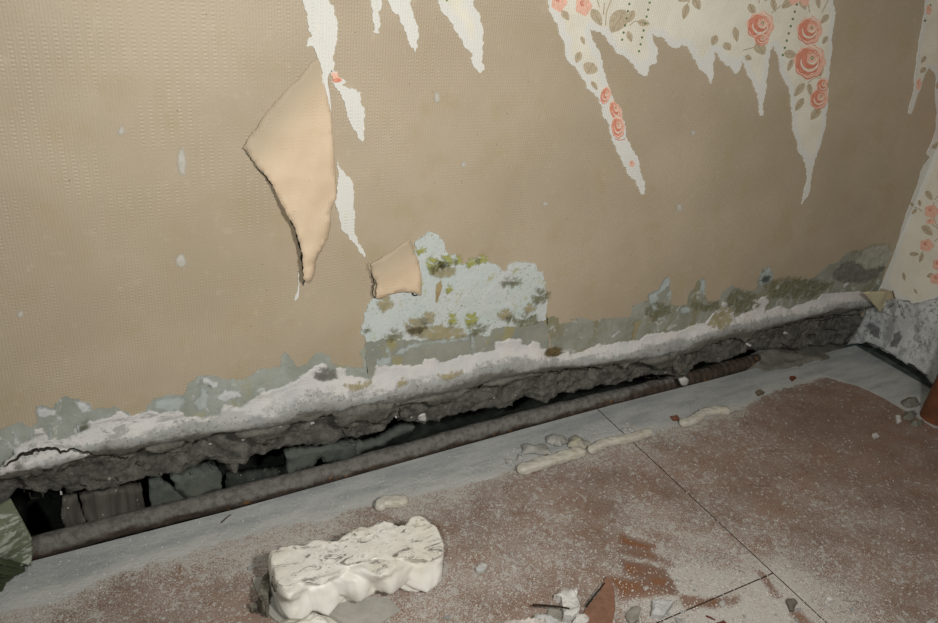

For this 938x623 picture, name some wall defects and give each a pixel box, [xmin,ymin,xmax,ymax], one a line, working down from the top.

peeling [302,0,338,84]
peeling [370,0,419,52]
peeling [438,0,485,73]
water stain [416,248,488,294]
water stain [377,296,394,313]
water stain [388,312,486,342]
peeling [146,246,890,417]
water stain [497,289,550,326]
water stain [868,324,880,339]
spalling [0,310,873,504]
crack [3,438,213,499]